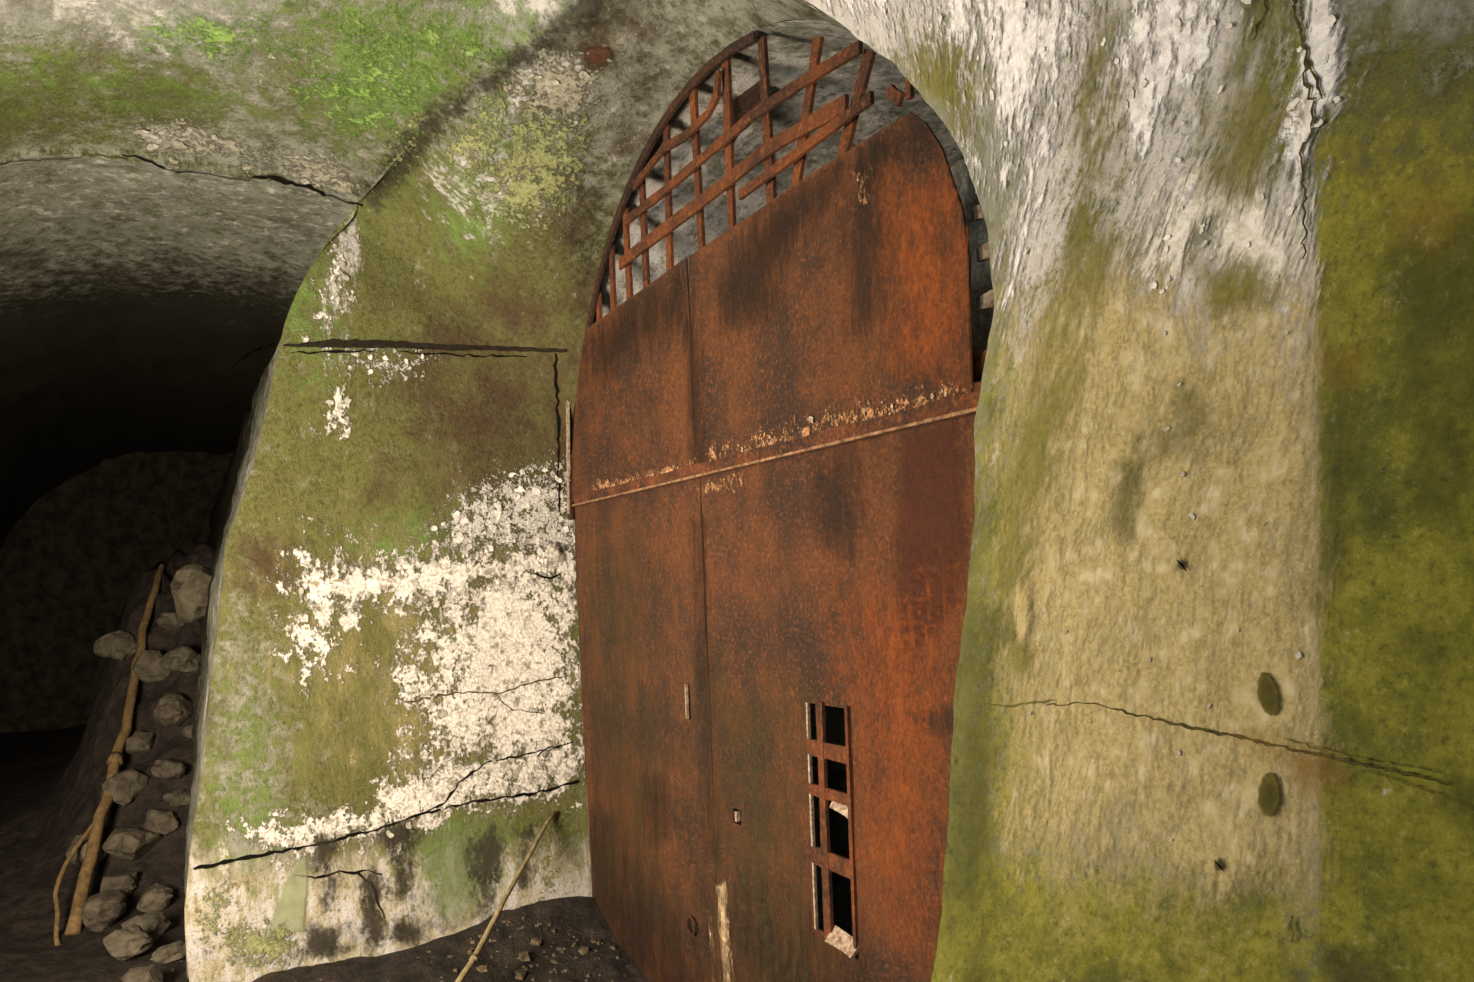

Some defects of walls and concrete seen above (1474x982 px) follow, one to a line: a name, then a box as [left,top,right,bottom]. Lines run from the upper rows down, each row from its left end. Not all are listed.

crack [0,153,363,207]
water stain [851,139,890,322]
crack [1253,0,1323,259]
crack [231,339,567,512]
peeling [809,0,1348,900]
peeling [220,448,587,872]
water stain [301,833,340,960]
crack [194,676,579,919]
water stain [358,816,420,947]
crack [985,699,1474,810]